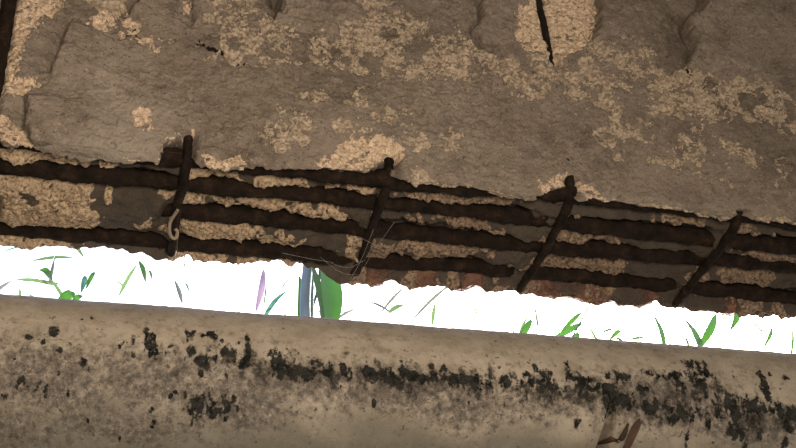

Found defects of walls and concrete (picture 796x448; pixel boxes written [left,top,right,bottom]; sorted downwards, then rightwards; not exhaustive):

spalling [84,0,796,189]
spalling [0,0,140,250]
spalling [157,152,350,221]
spalling [179,218,307,247]
rust [362,268,398,288]
rust [416,270,486,293]
rust [523,280,660,309]
rust [690,297,737,316]
water stain [25,326,60,345]
water stain [118,327,175,360]
water stain [1,373,49,400]
water stain [168,330,796,448]